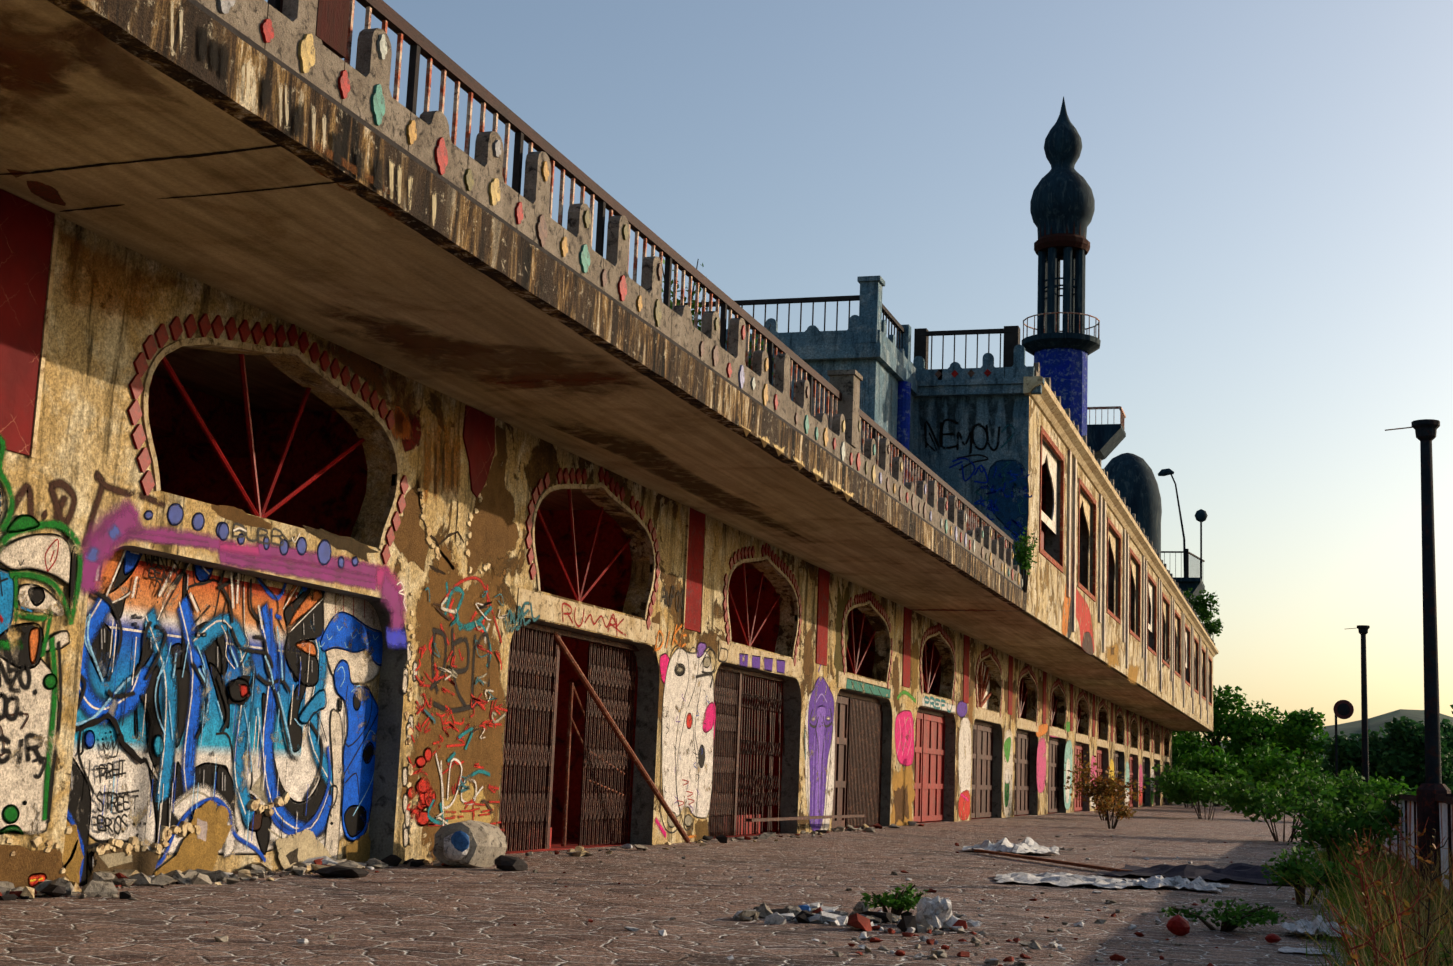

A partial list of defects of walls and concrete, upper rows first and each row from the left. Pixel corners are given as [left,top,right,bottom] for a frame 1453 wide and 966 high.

crack [0,145,281,175]
crack [60,182,336,212]
water stain [317,308,606,440]
water stain [919,397,1015,452]
water stain [550,426,806,539]
water stain [741,425,853,502]
flaking render [303,525,379,562]
flaking render [390,426,520,861]
flaking render [247,791,290,817]
crack [62,840,78,869]
flaking render [0,800,232,888]
flaking render [275,829,371,869]